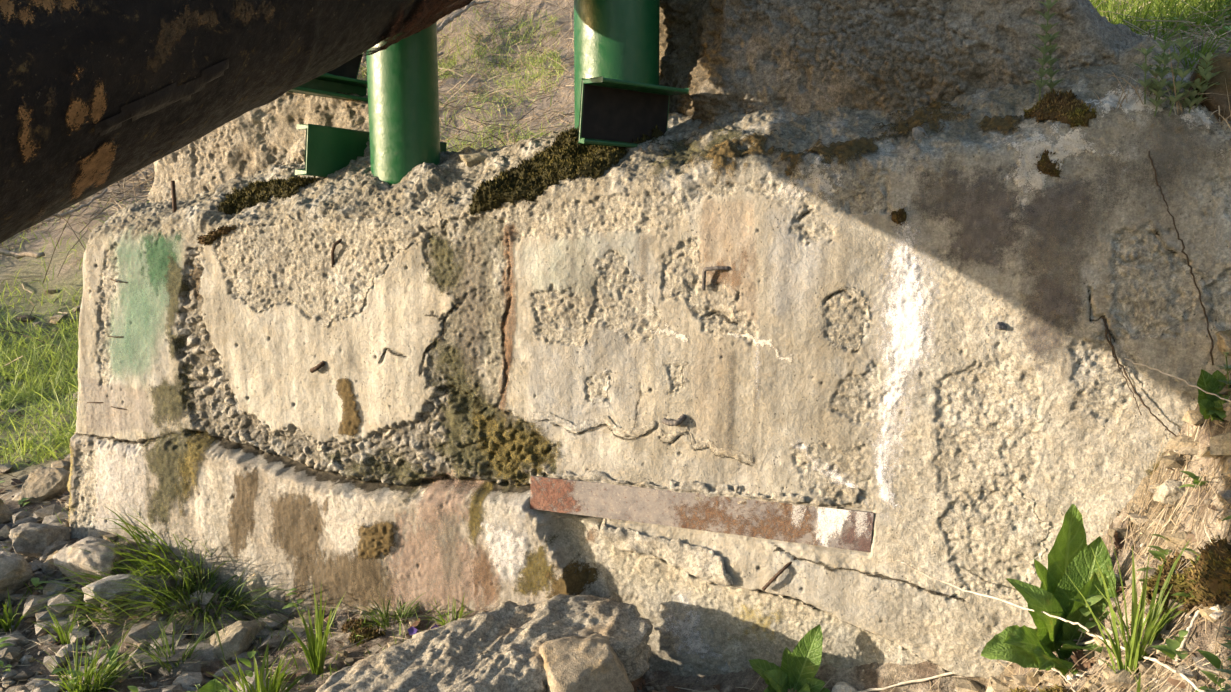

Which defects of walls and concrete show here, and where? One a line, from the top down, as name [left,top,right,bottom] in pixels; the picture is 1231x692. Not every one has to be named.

damp [912,84,1231,374]
crack [1088,290,1115,342]
spalling [176,210,861,510]
damp [873,222,938,518]
rust [530,476,581,513]
rust [669,493,874,552]
crack [749,590,817,610]
crack [771,543,965,602]